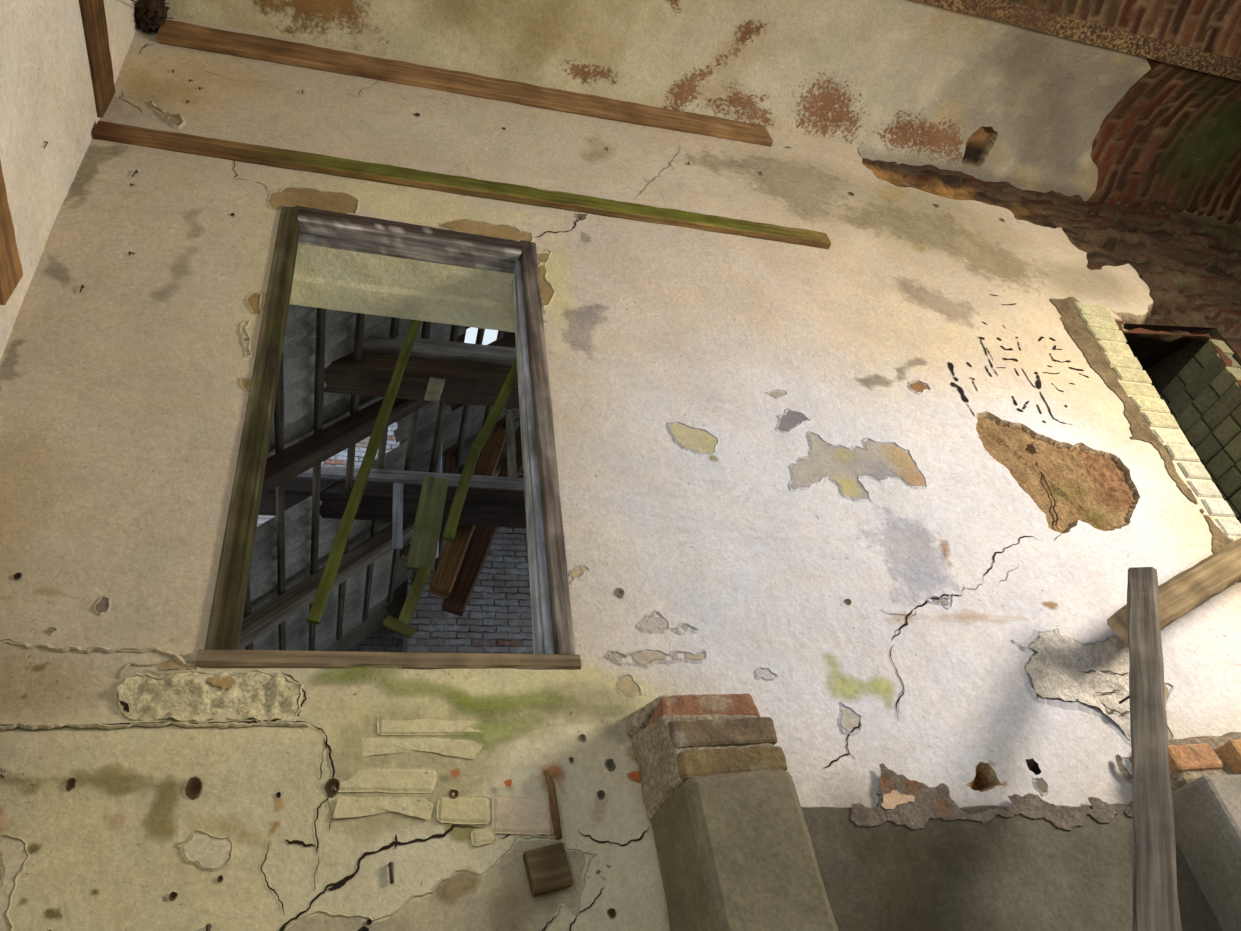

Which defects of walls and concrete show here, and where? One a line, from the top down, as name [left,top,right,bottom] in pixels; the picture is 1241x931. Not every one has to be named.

spalling [856,58,1241,358]
peeling [764,389,928,503]
spalling [976,411,1141,533]
crack [0,639,192,667]
spalling [113,653,304,726]
crack [0,672,649,931]
leakage [556,690,641,781]
crack [824,717,861,768]
crack [878,534,1061,718]
spalling [851,761,1133,830]
spalling [1012,628,1132,780]
spalling [1164,681,1175,739]